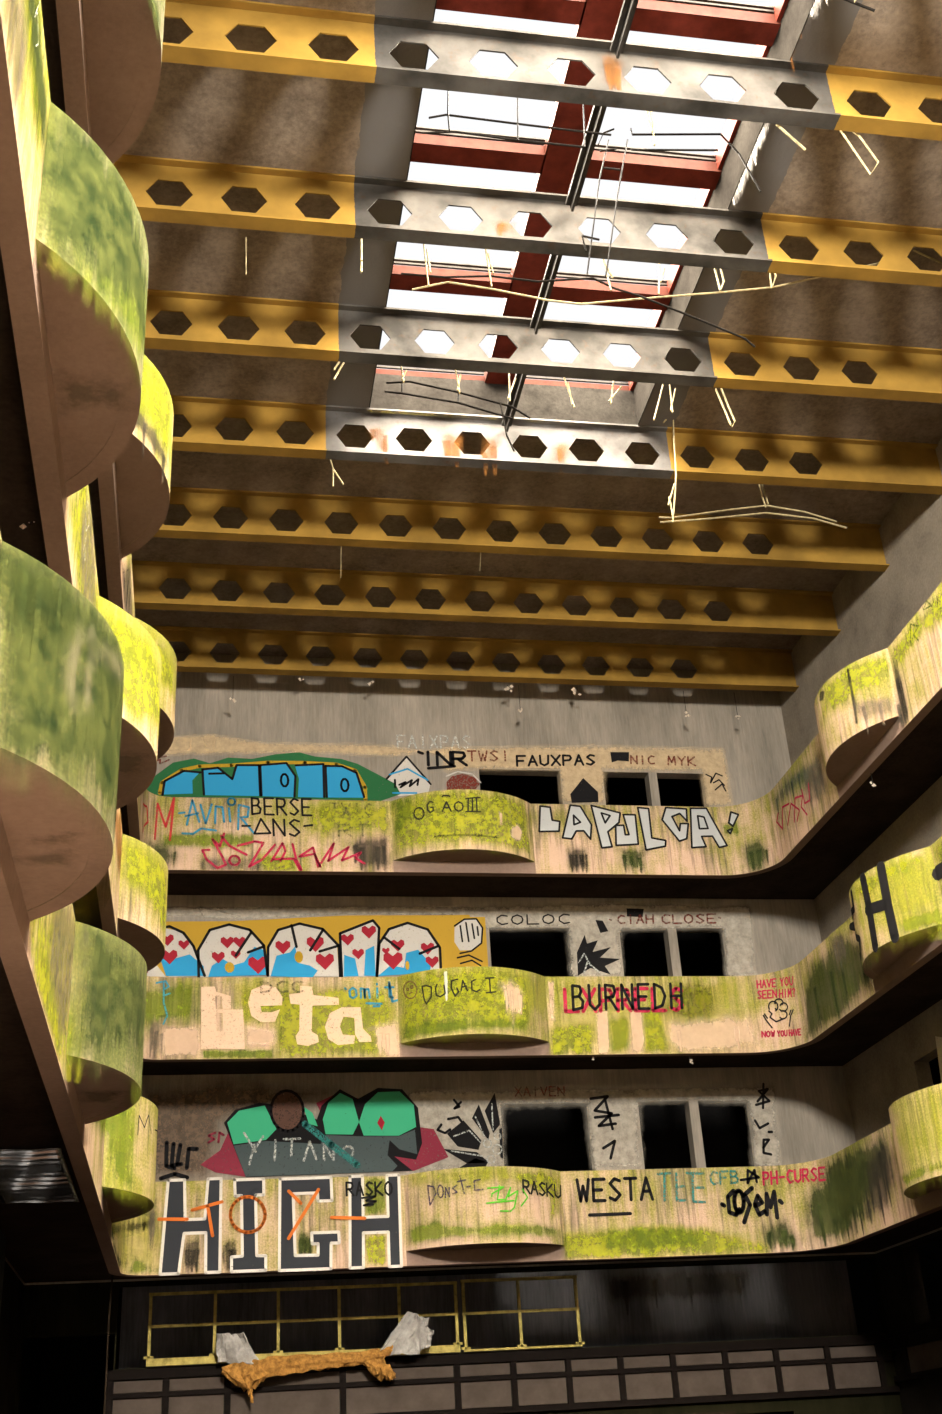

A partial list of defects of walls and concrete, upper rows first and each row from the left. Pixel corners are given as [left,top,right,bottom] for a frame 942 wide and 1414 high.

water stain [767,1223,797,1249]
water stain [806,1139,893,1246]